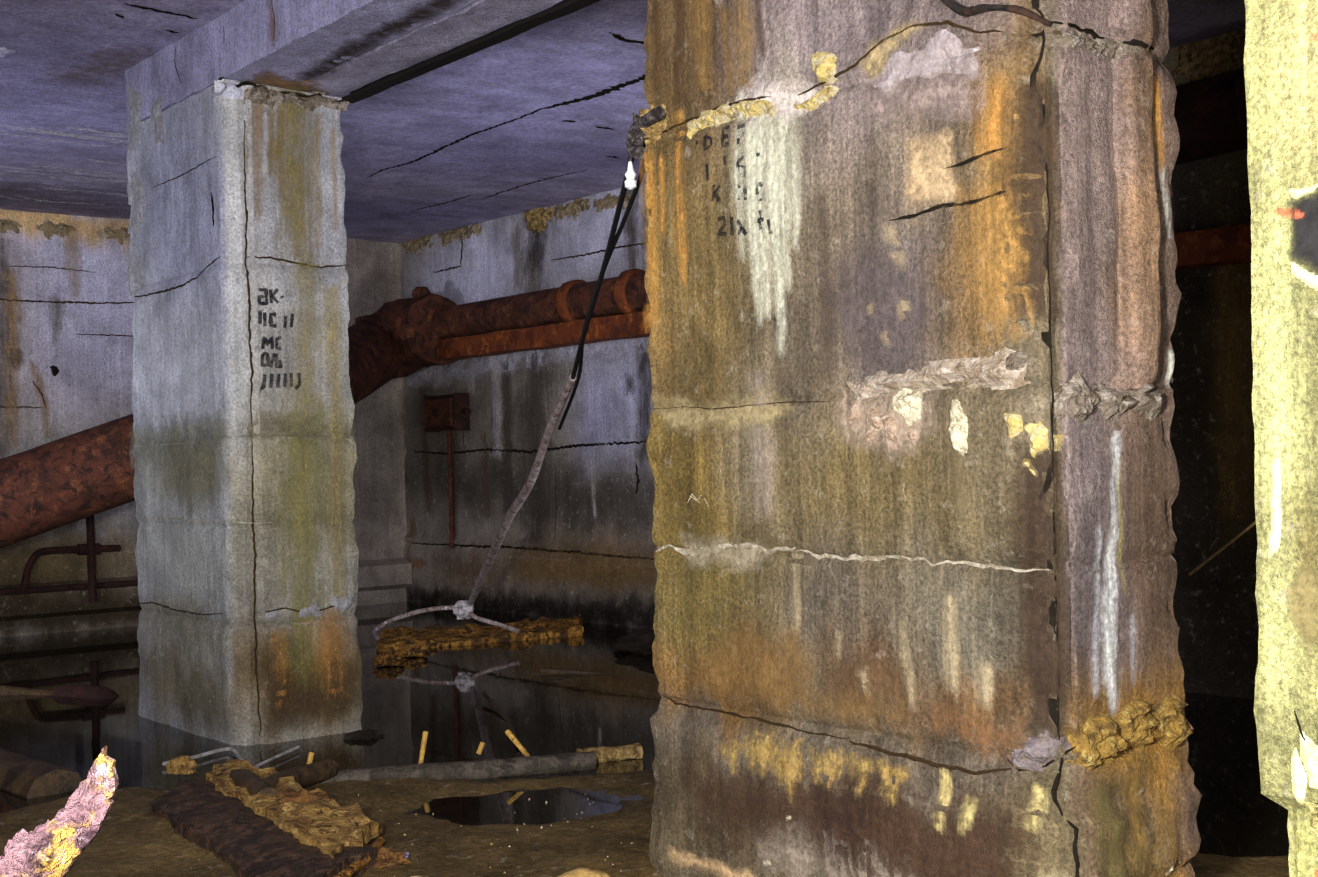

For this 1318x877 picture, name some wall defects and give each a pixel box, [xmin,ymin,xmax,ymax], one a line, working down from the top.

crack [643,0,1154,140]
water stain [272,102,311,253]
crack [366,75,646,211]
water stain [686,51,840,285]
crack [889,191,1005,221]
crack [943,147,1010,169]
water stain [1016,87,1054,313]
water stain [132,420,272,524]
crack [1041,164,1080,877]
water stain [474,600,654,629]
water stain [1004,413,1193,771]
crack [655,692,1012,775]